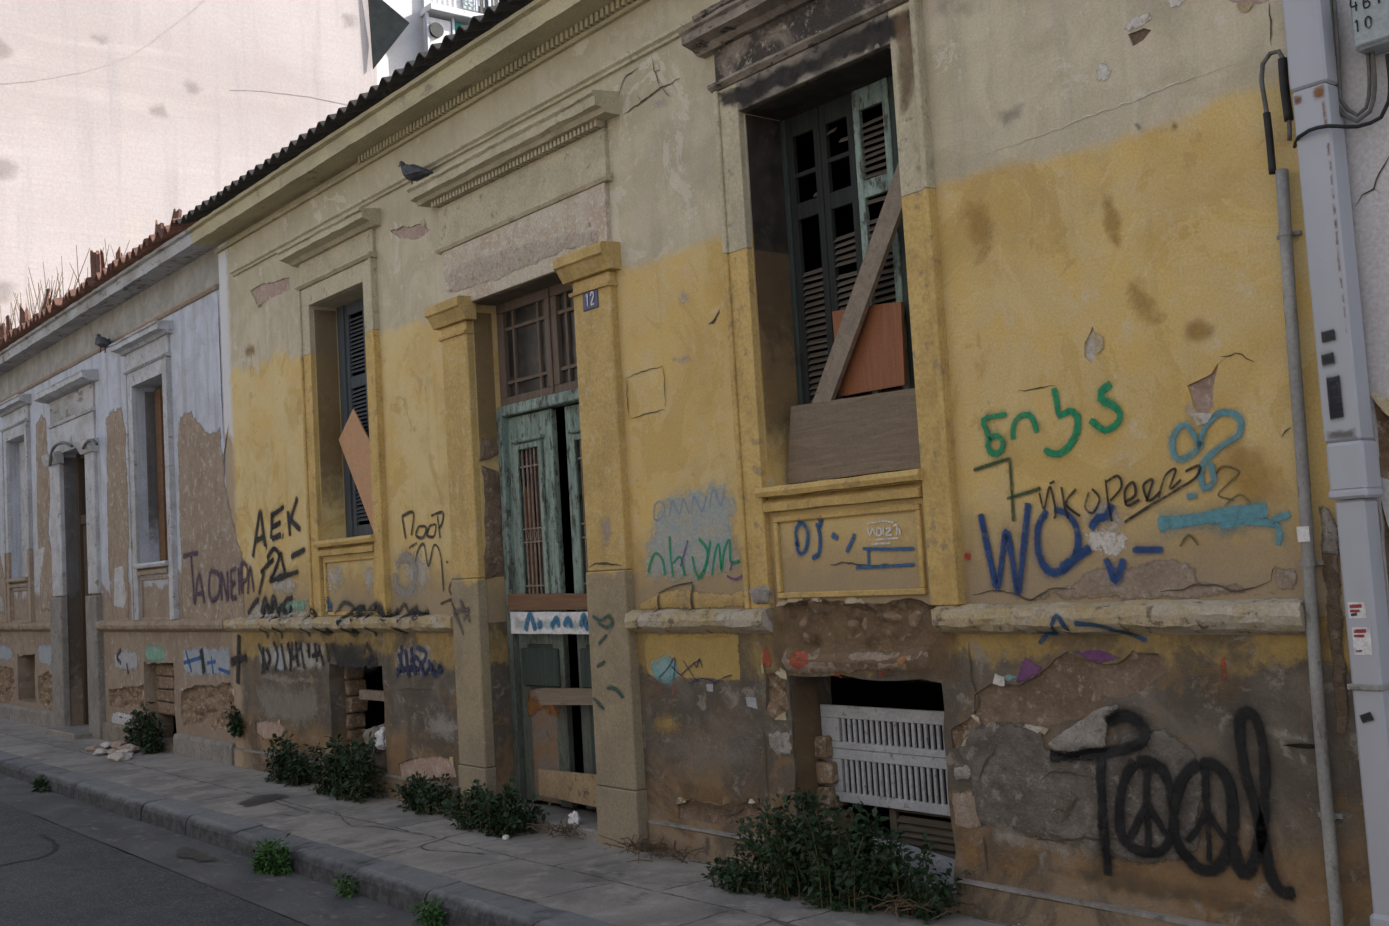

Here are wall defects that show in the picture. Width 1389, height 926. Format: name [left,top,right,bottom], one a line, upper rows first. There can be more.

peeling [1124,12,1152,45]
flaking render [1229,0,1269,12]
crack [1356,157,1389,205]
flaking render [251,278,291,307]
flaking render [1184,366,1218,425]
flaking render [1369,391,1389,480]
peeling [178,411,245,619]
flaking render [1378,508,1389,582]
flaking render [749,585,936,655]
flaking render [181,682,235,731]
flaking render [1048,705,1118,753]
flaking render [952,765,981,829]